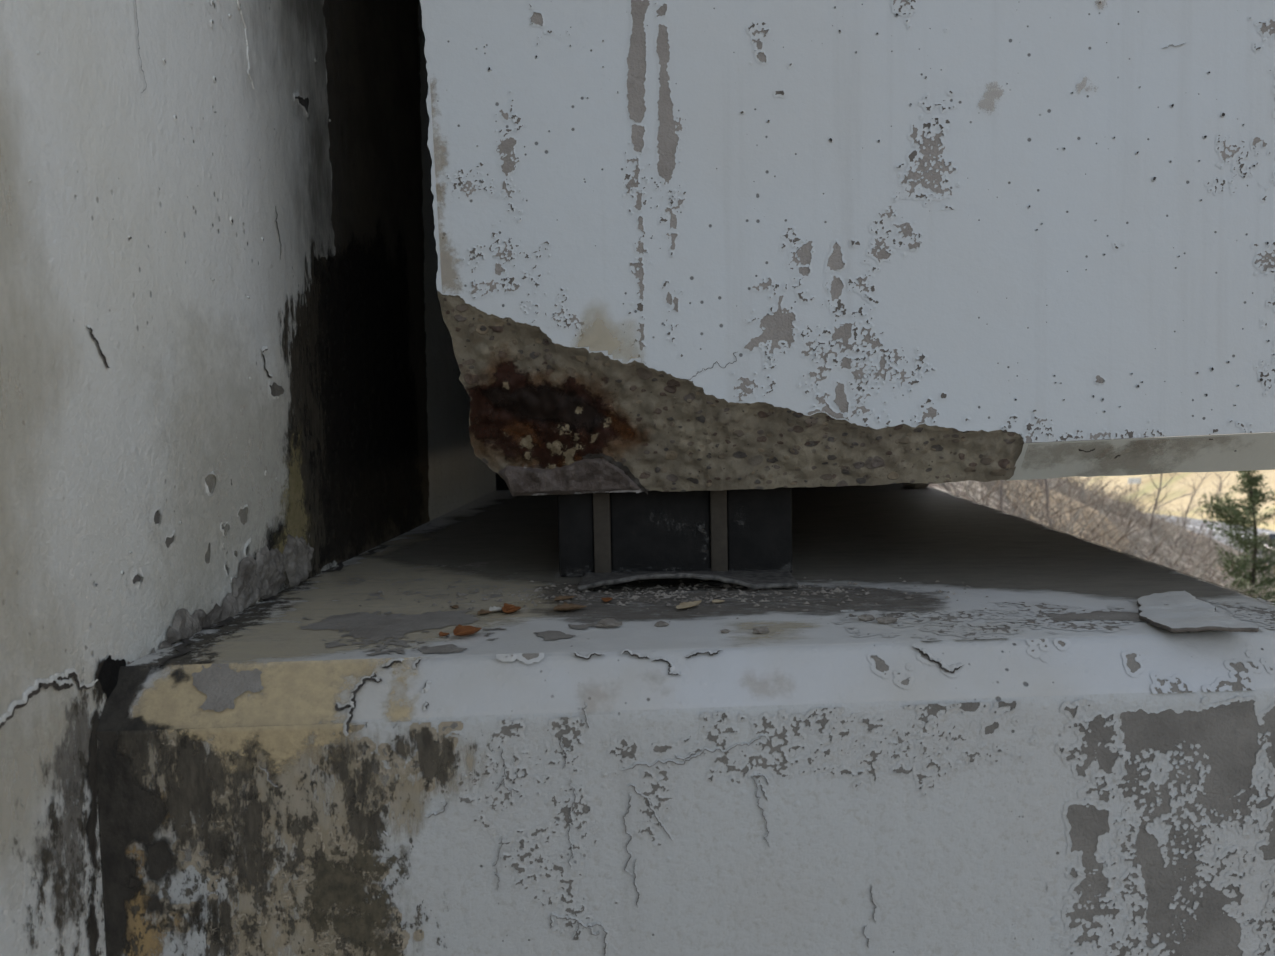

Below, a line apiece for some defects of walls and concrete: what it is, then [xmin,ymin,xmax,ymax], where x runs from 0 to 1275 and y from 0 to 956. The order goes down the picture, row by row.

rust [466,359,647,469]
water stain [504,406,611,470]
spalling [127,0,1166,665]
crack [0,667,98,729]
water stain [12,223,562,956]
peeling [145,717,601,956]
crack [559,702,590,869]
crack [620,734,770,908]
peeling [601,701,1042,849]
crack [912,644,964,674]
peeling [833,600,1144,689]
peeling [1047,649,1275,956]